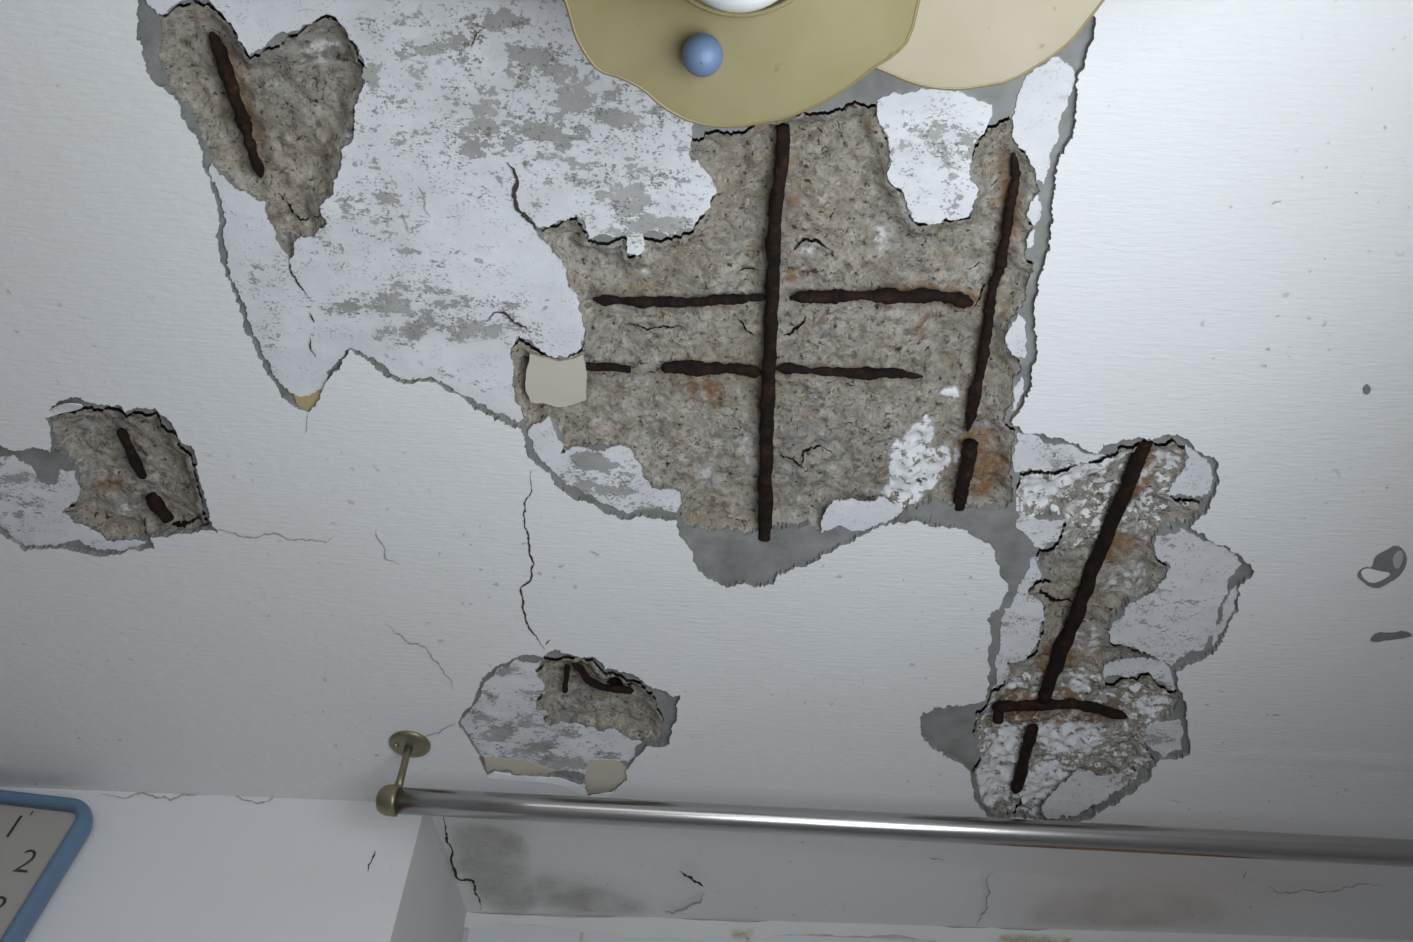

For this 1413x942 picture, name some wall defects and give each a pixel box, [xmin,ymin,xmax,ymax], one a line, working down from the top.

spalling [0,397,212,554]
spalling [139,0,1252,822]
crack [520,470,550,648]
peeling [1357,546,1407,588]
corrosion [1000,689,1116,724]